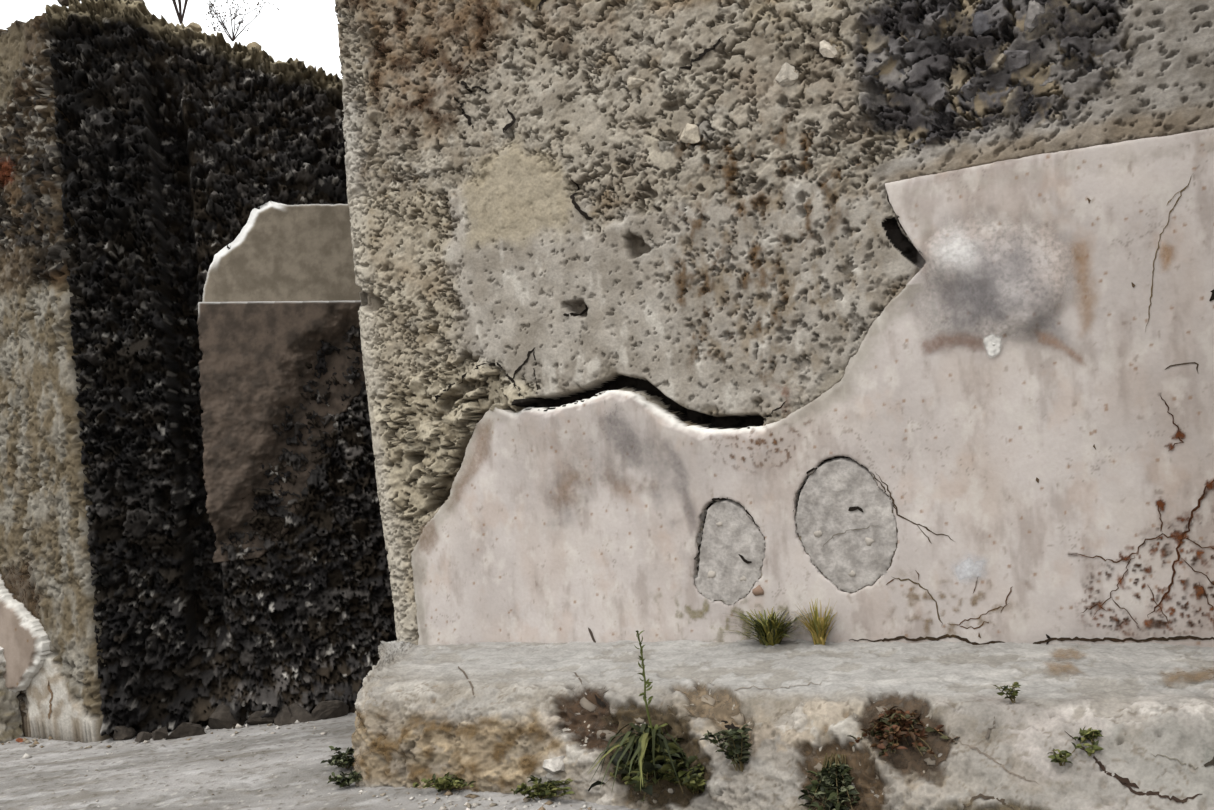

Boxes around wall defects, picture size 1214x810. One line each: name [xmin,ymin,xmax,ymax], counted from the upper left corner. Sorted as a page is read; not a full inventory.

crack [1145,173,1194,332]
crack [425,347,786,430]
spalling [694,497,766,605]
spalling [793,456,898,593]
crack [875,472,955,544]
crack [1065,731,1214,803]